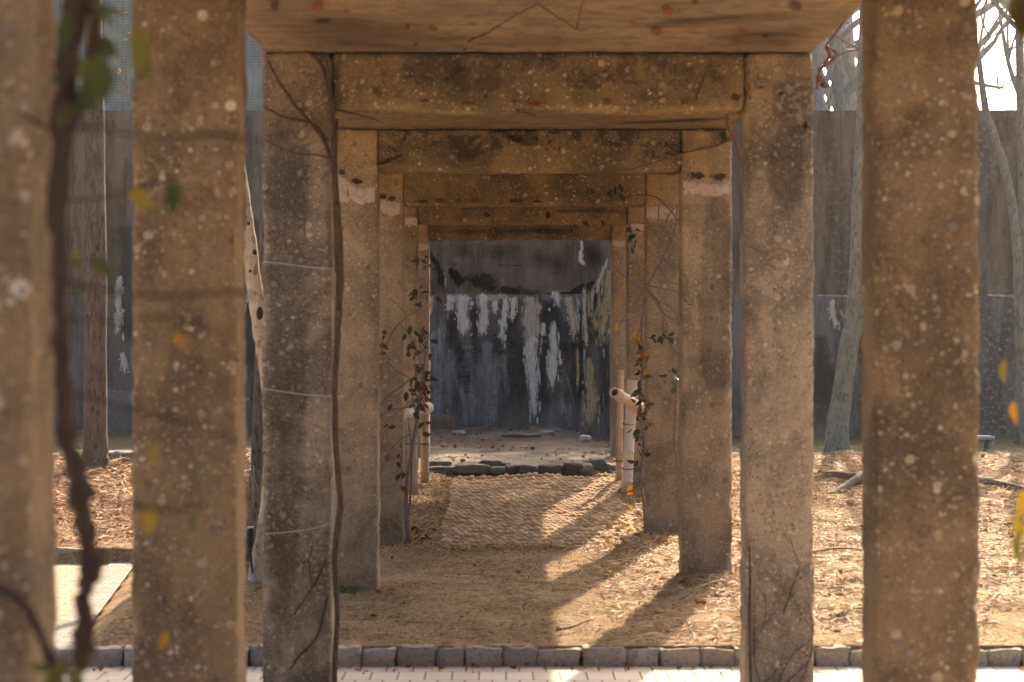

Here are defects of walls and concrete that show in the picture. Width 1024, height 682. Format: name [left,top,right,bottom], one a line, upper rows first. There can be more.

damp [376,120,714,162]
damp [430,229,610,428]